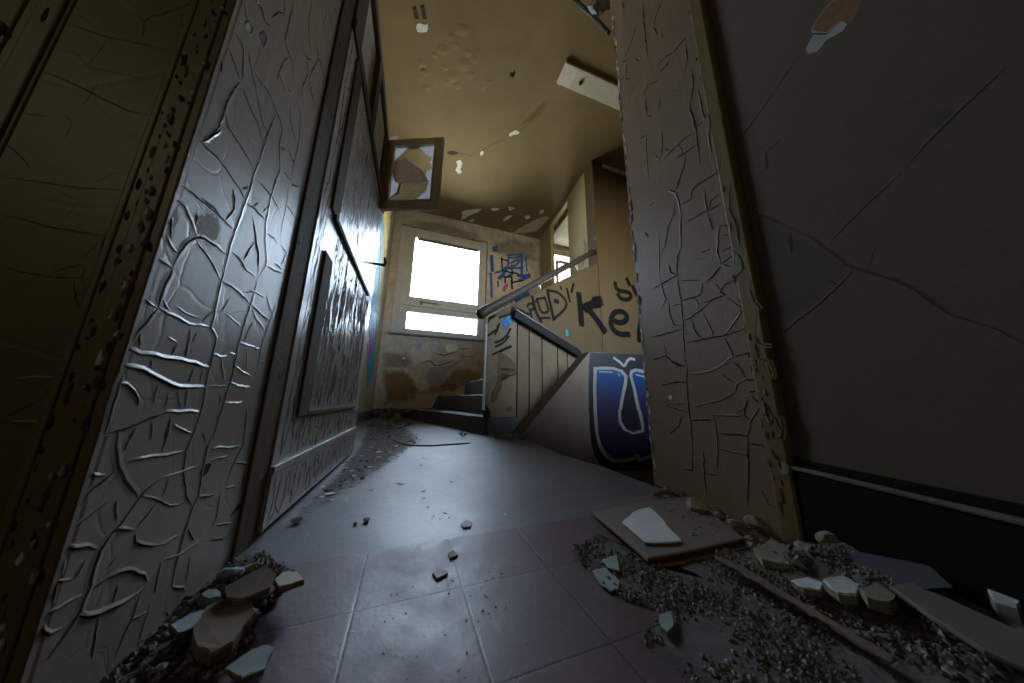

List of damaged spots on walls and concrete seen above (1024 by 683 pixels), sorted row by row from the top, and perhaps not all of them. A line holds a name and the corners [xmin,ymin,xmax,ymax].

peeling [416,23,428,33]
flaking render [812,0,862,34]
crack [0,144,122,279]
peeling [460,206,551,234]
peeling [588,0,656,472]
crack [621,0,1024,508]
crack [23,0,382,662]
damp [385,370,474,402]